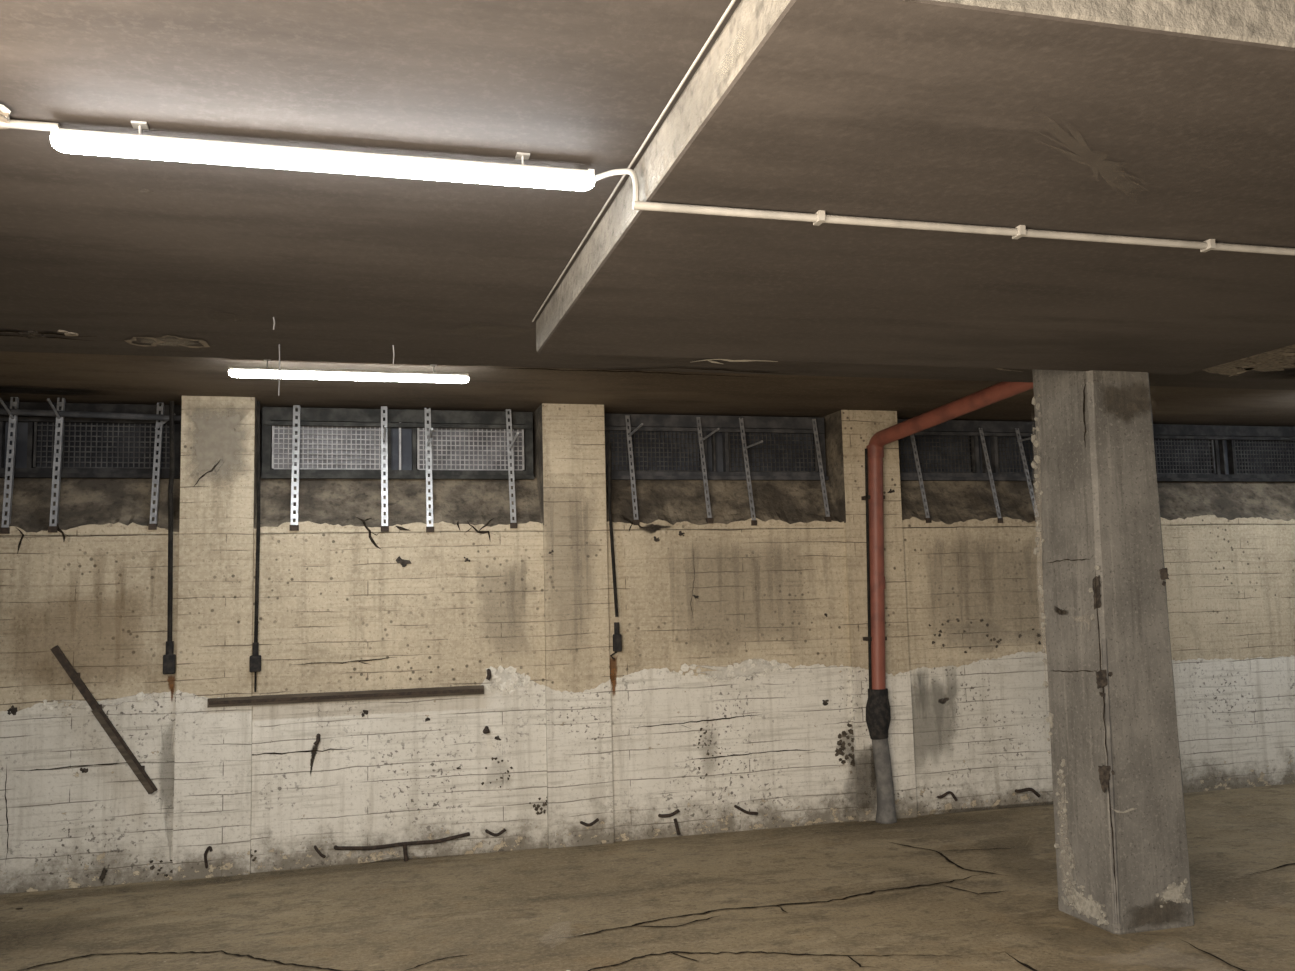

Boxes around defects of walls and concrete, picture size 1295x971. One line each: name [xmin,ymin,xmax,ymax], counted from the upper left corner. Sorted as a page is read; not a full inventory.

peeling [1203,344,1295,377]
crack [530,842,1010,971]
crack [18,950,472,971]
crack [933,952,1038,971]
crack [1180,939,1246,971]